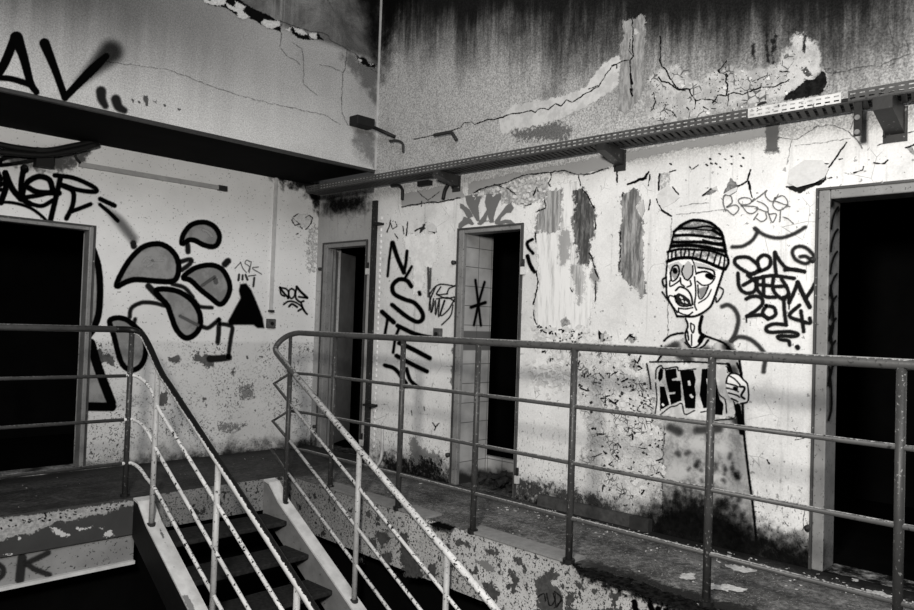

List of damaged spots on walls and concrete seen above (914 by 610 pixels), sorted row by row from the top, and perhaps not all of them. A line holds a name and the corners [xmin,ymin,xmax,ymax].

spalling [204,0,324,41]
crack [181,20,359,123]
crack [414,20,790,140]
peeling [645,32,829,128]
leakage [751,33,777,64]
peeling [626,126,766,162]
crack [779,122,888,174]
peeling [618,170,679,299]
peeling [402,157,666,513]
peeling [0,500,134,542]
peeling [359,529,437,578]
spalling [429,521,471,549]